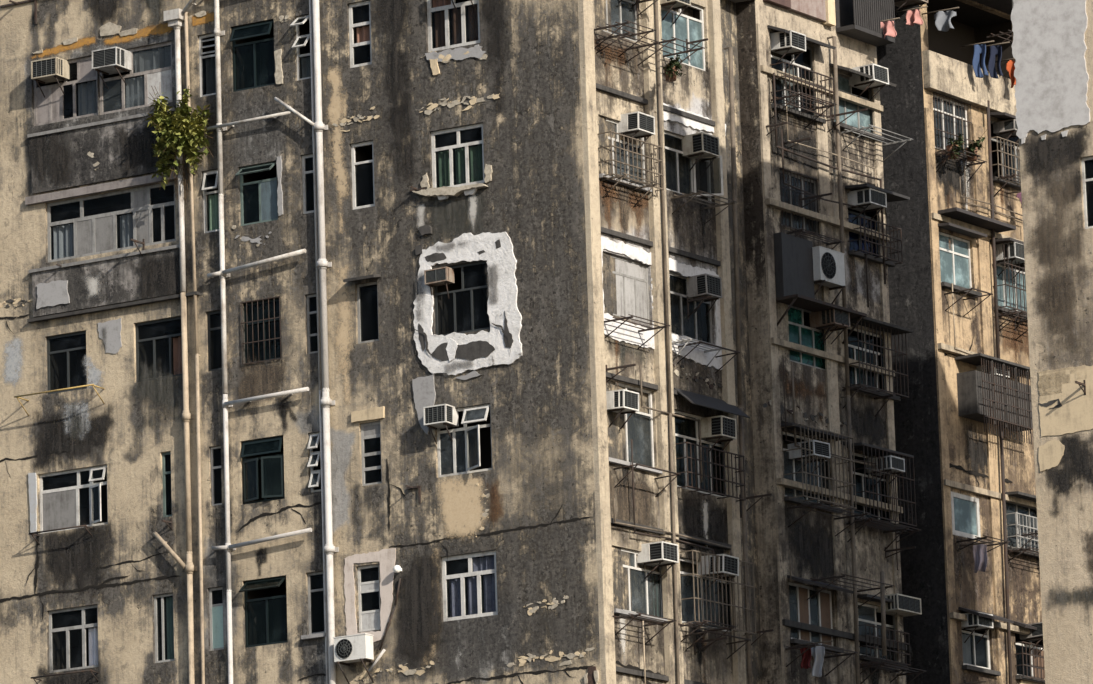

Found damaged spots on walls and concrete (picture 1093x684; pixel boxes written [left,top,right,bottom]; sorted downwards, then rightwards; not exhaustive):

peeling [421,44,487,75]
spalling [419,93,501,115]
peeling [327,68,380,233]
peeling [446,338,458,362]
crack [0,451,67,477]
crack [236,502,325,533]
crack [386,458,590,565]
crack [0,531,178,619]
peeling [524,596,569,616]
crack [447,660,666,684]